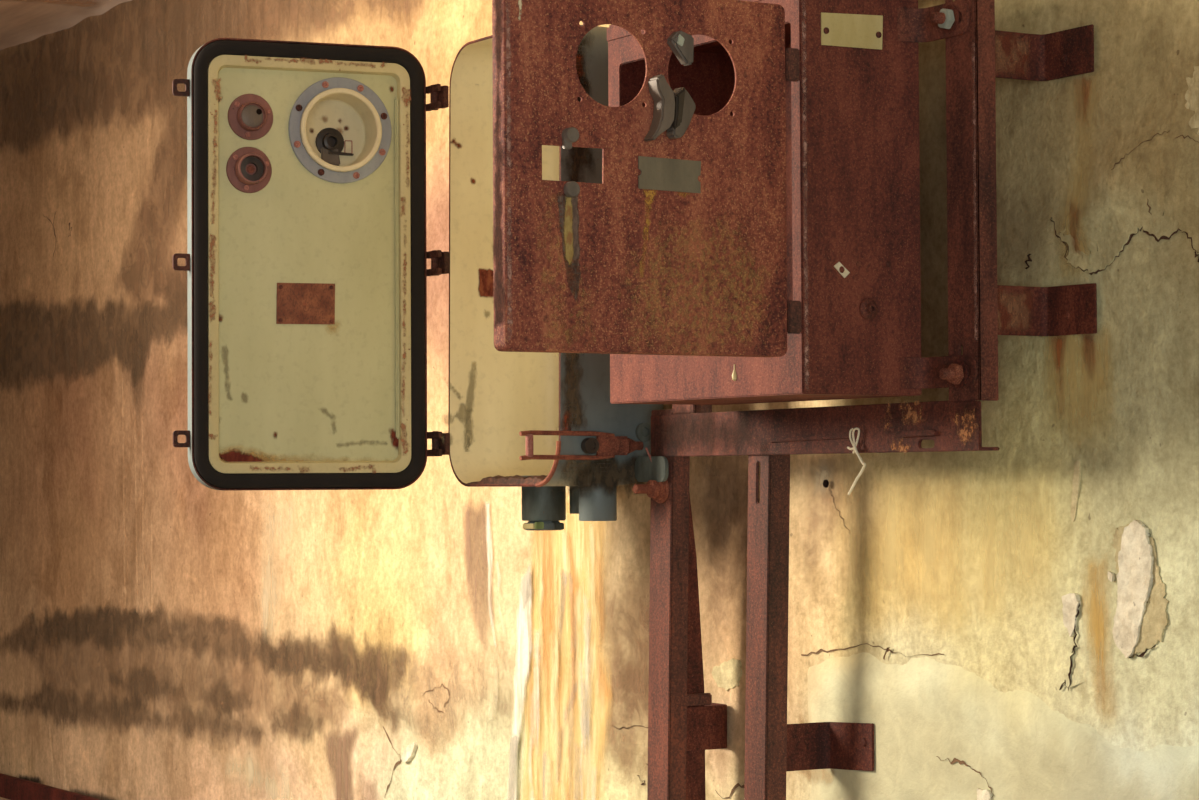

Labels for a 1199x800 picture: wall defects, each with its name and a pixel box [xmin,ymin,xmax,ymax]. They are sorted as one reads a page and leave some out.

rust [576,36,590,102]
flaking render [1185,66,1199,135]
water stain [0,0,415,388]
rust [566,147,592,182]
crack [1051,202,1199,275]
water stain [3,609,410,740]
water stain [481,567,531,800]
rust [522,353,647,800]
crack [801,643,944,660]
flaking render [1062,593,1081,653]
flaking render [1108,520,1169,658]
crack [936,756,994,798]